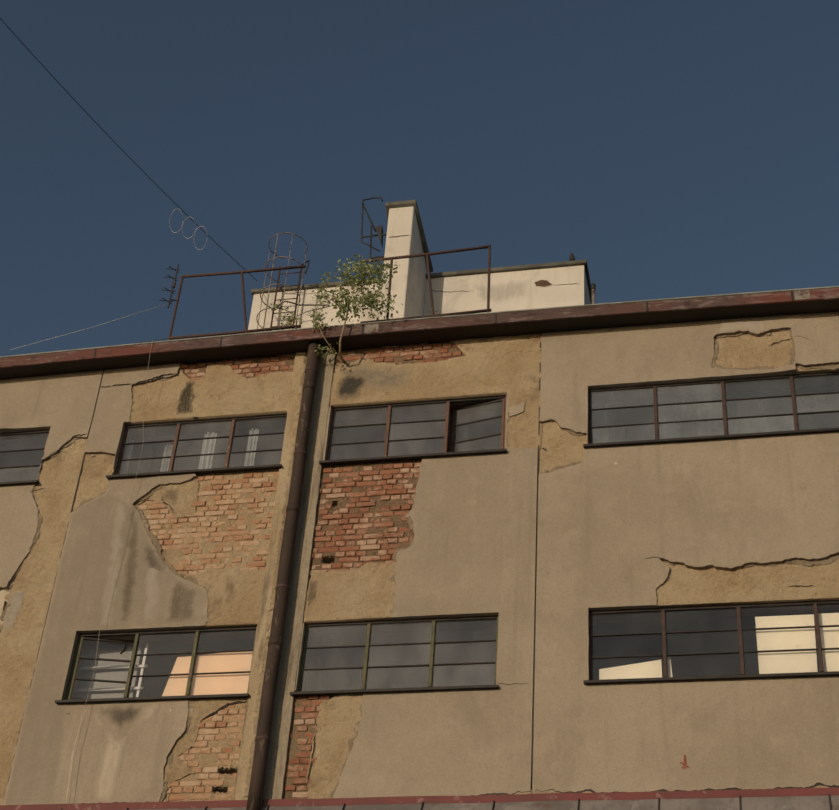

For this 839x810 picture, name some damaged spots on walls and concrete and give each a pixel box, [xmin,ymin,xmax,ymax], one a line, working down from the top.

flaking render [129,354,295,419]
leakage [334,359,414,401]
flaking render [333,343,465,373]
spalling [714,327,794,341]
flaking render [132,472,279,575]
flaking render [309,463,421,576]
spalling [656,552,839,601]
leakage [2,493,207,805]
flaking render [160,699,246,801]
flaking render [285,690,333,799]